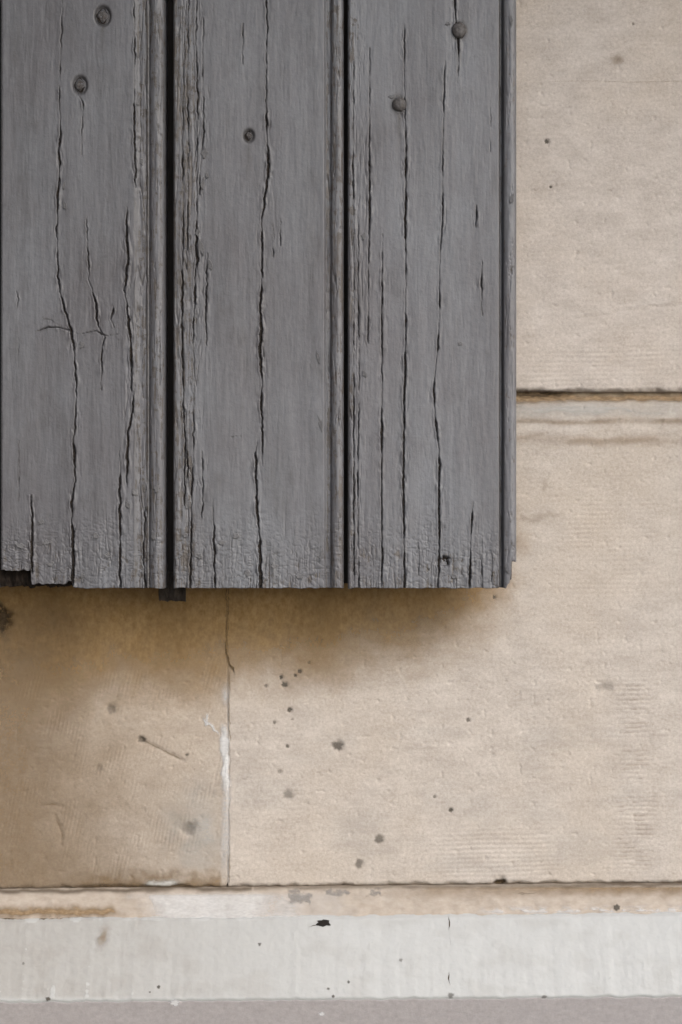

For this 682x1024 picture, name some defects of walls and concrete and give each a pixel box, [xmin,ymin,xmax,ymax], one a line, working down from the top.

crack [39,6,146,586]
crack [181,6,235,883]
crack [244,90,281,588]
crack [443,0,465,111]